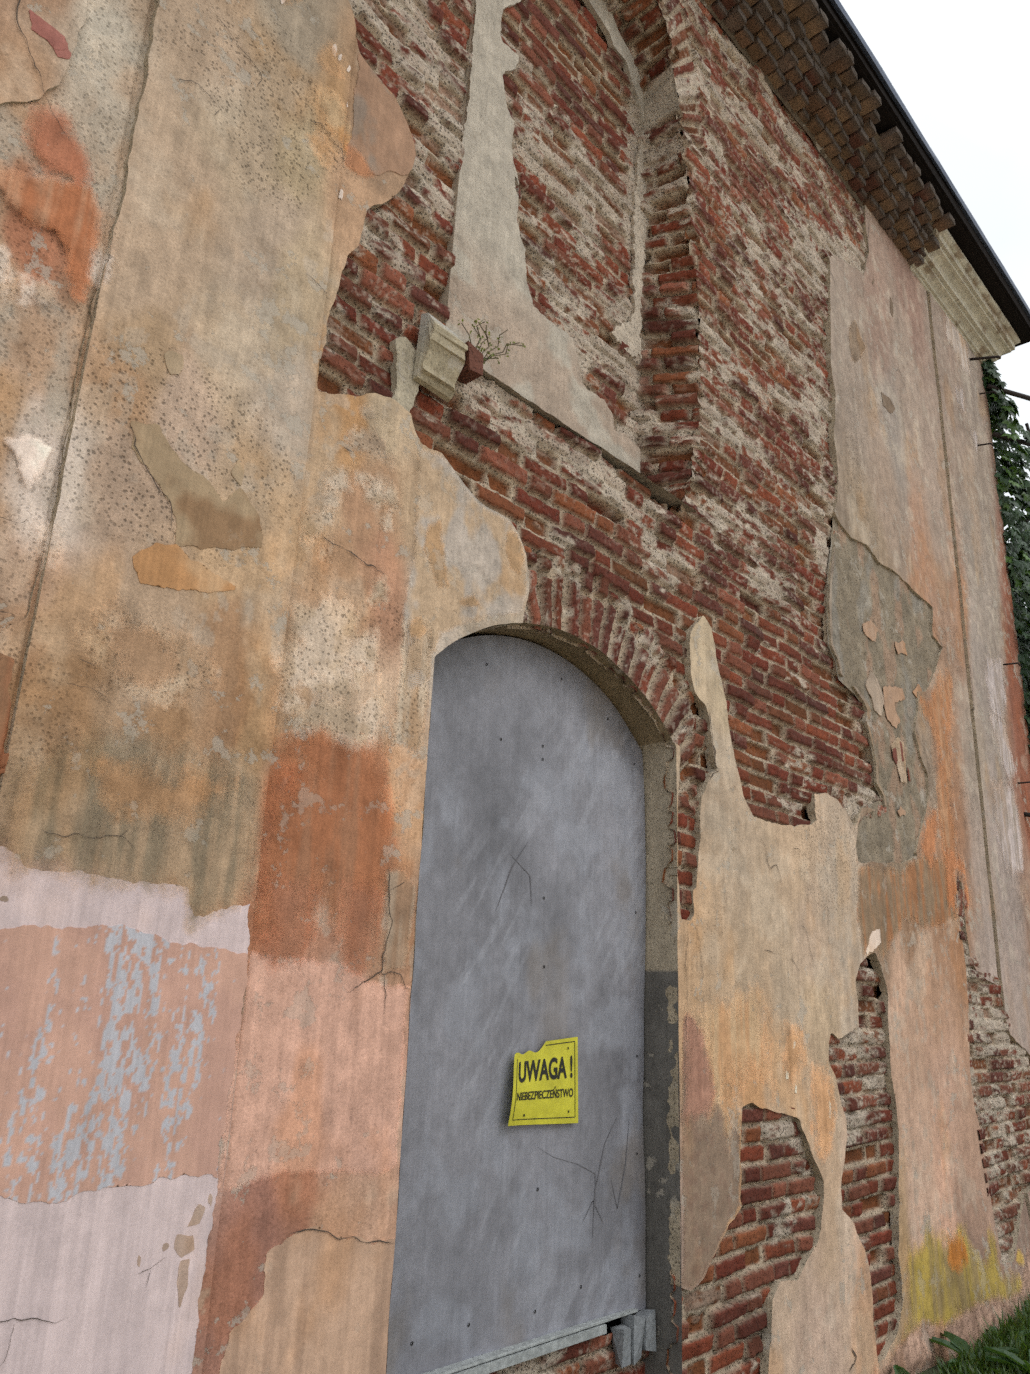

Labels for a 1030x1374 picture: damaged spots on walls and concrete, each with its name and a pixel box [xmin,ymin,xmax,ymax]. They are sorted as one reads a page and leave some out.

crack [16,0,71,142]
spalling [130,421,262,593]
flaking render [281,0,940,924]
flaking render [489,1330,649,1374]
flaking render [666,1104,820,1374]
flaking render [829,958,897,1357]
flaking render [955,876,1030,1262]